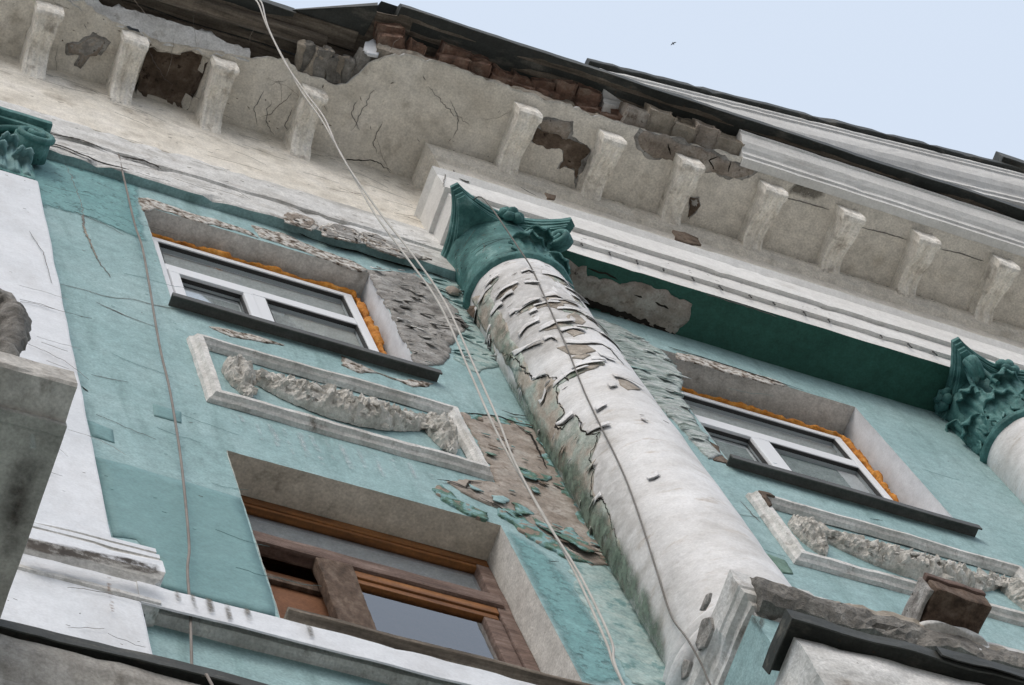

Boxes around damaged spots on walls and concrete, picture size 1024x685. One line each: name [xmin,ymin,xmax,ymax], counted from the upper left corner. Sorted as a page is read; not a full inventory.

spalling [65,0,251,110]
crack [7,1,523,330]
flaking render [531,117,591,188]
flaking render [634,128,758,180]
crack [27,336,196,391]
spalling [138,197,789,600]
crack [51,413,238,491]